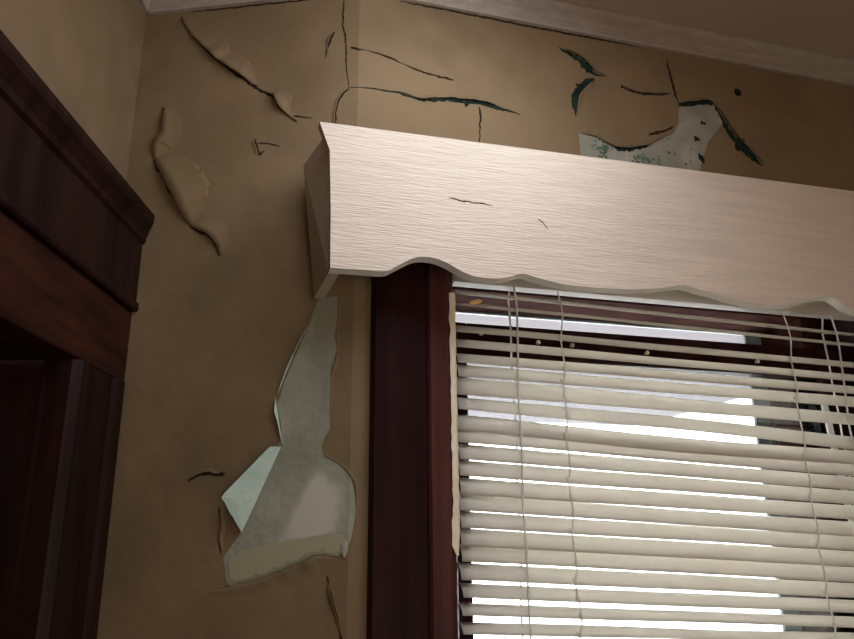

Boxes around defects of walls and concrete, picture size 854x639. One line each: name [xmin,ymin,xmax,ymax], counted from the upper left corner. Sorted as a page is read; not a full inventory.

crack [667,60,679,102]
peeling [579,96,764,171]
peeling [208,296,359,599]